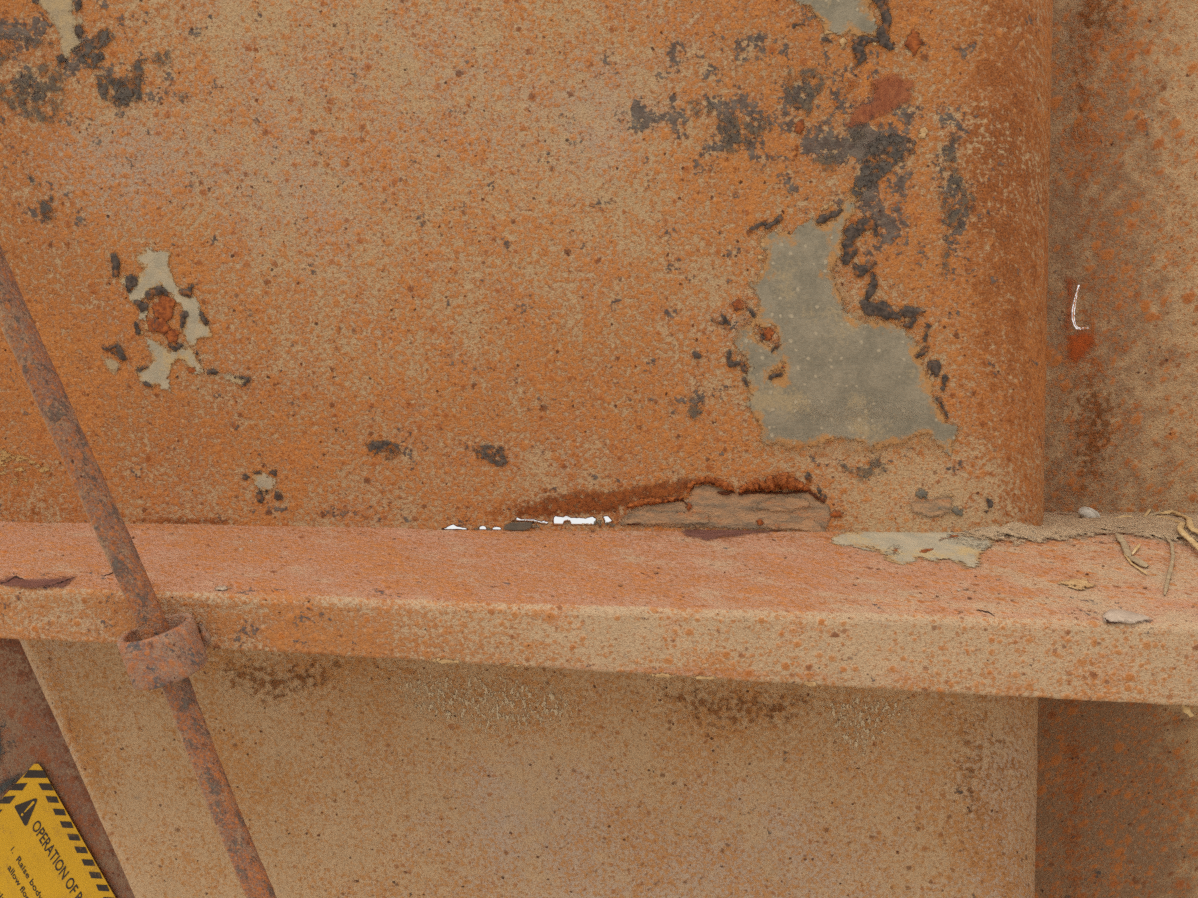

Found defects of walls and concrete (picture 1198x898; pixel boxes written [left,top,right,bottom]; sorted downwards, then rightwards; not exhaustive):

peeling [32,0,84,63]
peeling [792,0,923,67]
peeling [101,246,252,395]
peeling [711,183,961,457]
corrosion [1067,281,1122,488]
peeling [242,469,283,504]
corrosion [514,479,693,518]
spalling [593,472,995,568]